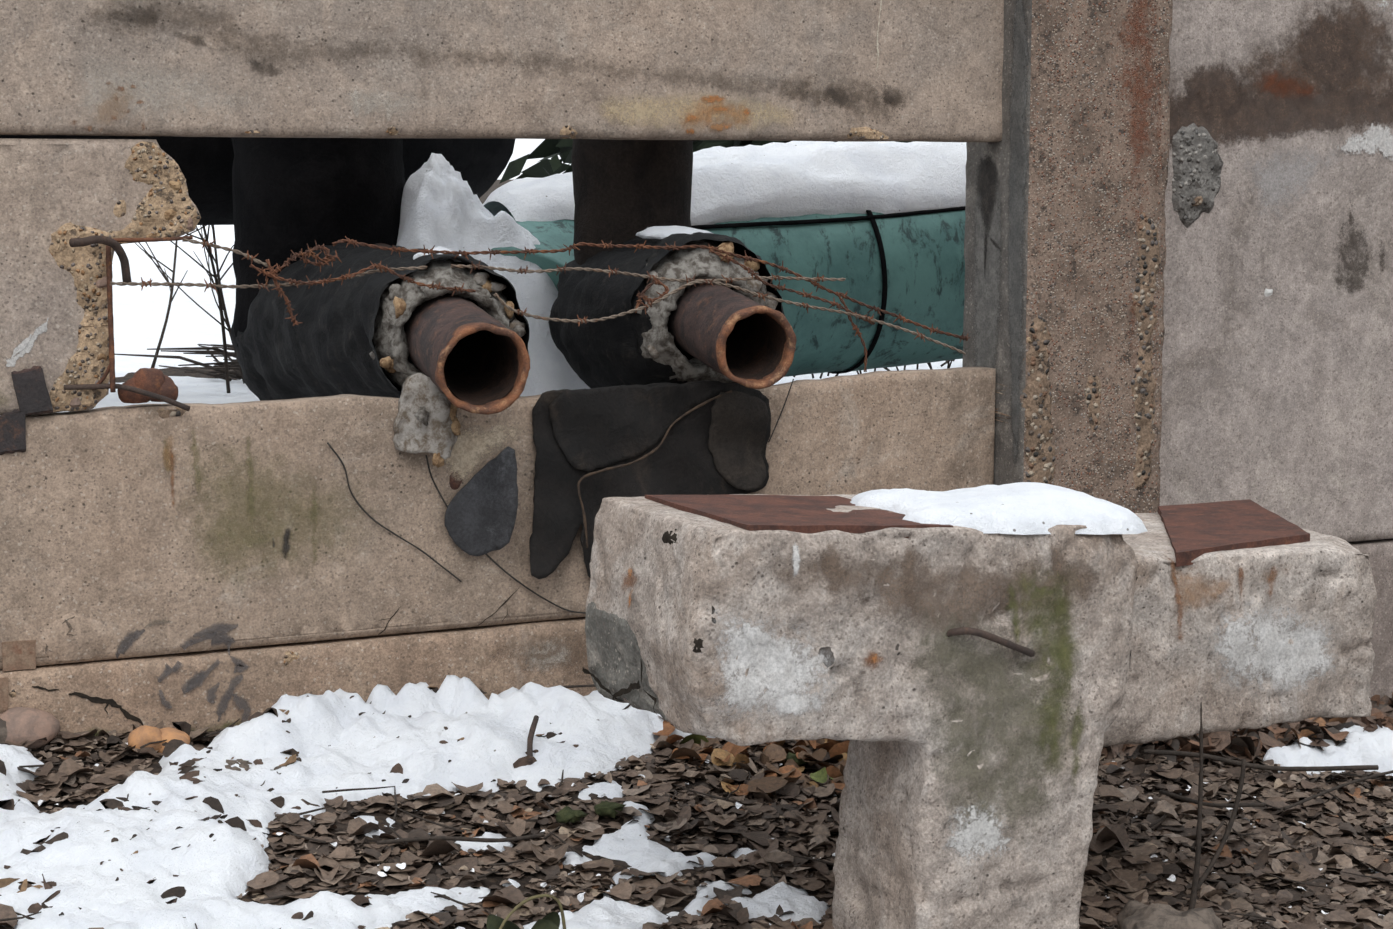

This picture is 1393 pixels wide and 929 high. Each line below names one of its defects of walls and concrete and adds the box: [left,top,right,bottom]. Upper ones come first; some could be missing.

leakage [1169,0,1393,147]
spalling [48,141,201,419]
leakage [1336,205,1385,292]
spalling [585,602,668,721]
leakage [718,617,828,715]
leakage [776,545,1093,680]
leakage [1072,710,1082,774]